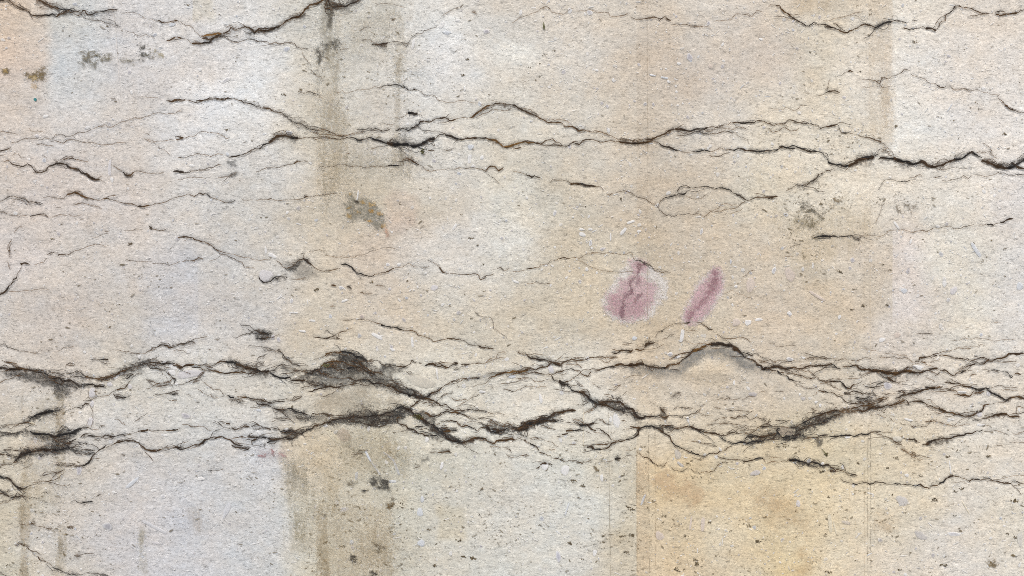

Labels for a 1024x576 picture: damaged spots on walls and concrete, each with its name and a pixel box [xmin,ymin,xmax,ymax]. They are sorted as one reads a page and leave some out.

crack [0,0,1024,298]
crack [0,305,1024,505]